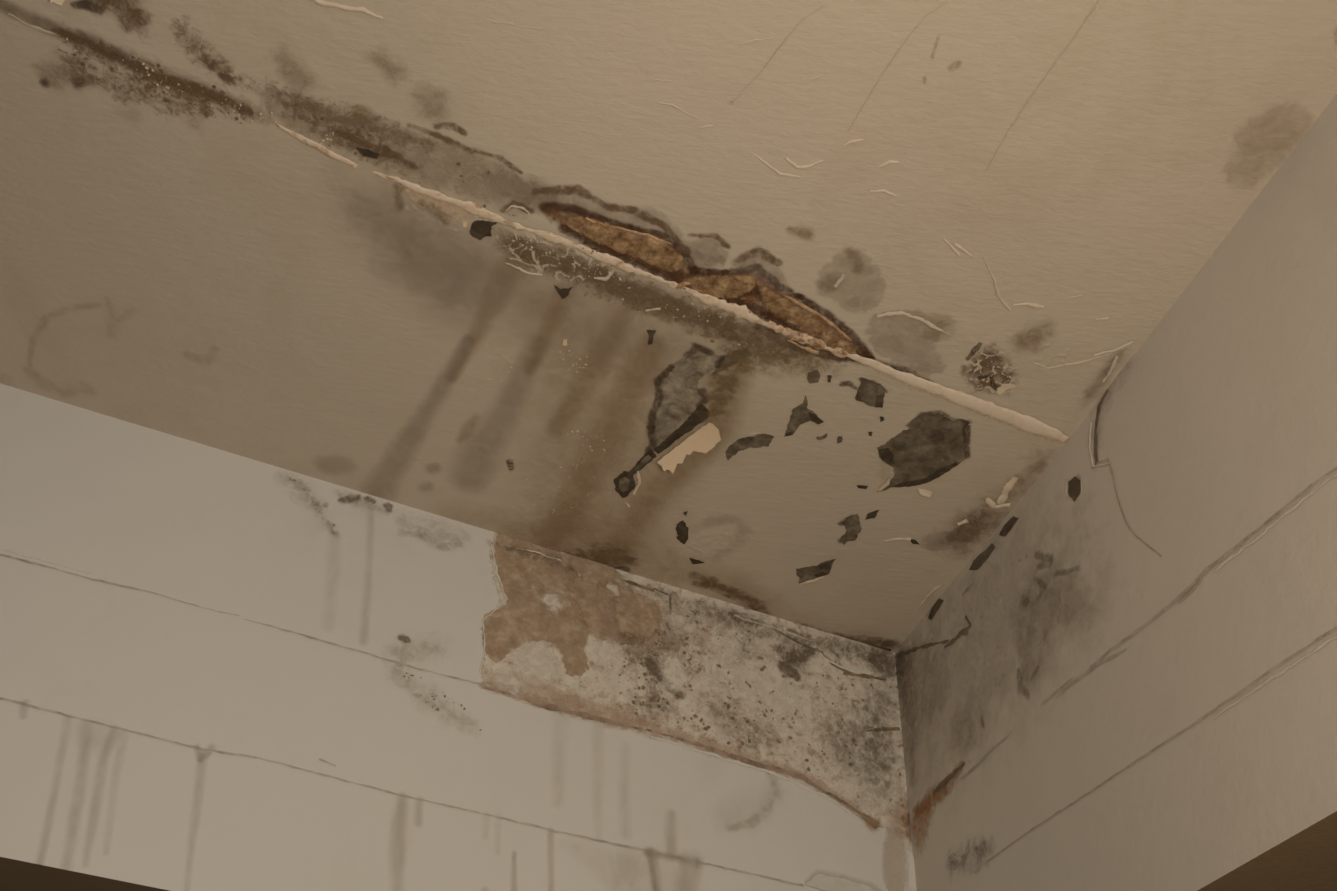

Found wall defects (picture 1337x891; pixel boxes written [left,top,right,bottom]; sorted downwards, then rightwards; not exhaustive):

peeling [50,0,147,30]
leakage [41,26,782,266]
leakage [877,311,950,335]
spalling [565,216,970,507]
leakage [339,495,392,511]
spalling [676,511,741,564]
spalling [838,510,879,545]
crack [1088,389,1162,557]
leakage [693,573,767,614]
crack [733,614,971,681]
crack [0,544,878,829]
crack [0,697,804,887]